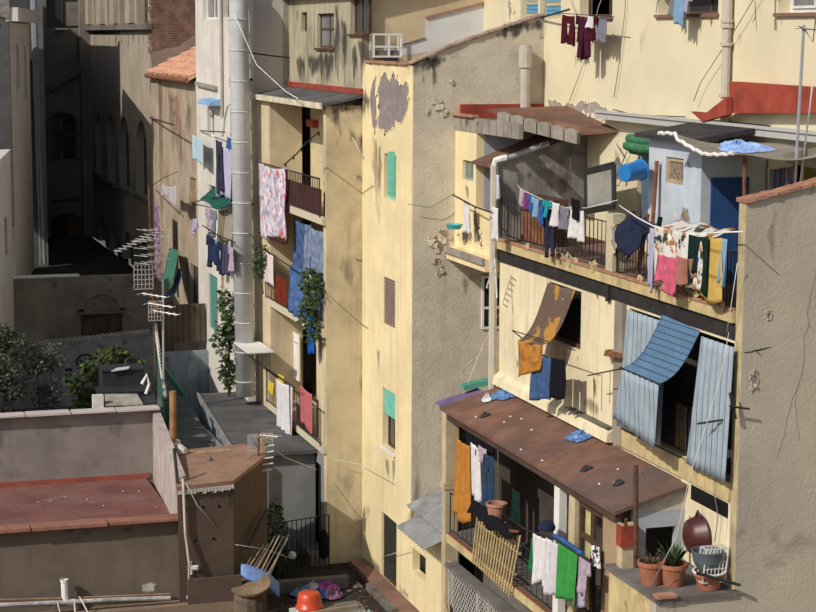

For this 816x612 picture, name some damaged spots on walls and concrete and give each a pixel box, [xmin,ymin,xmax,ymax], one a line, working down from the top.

leakage [296,8,368,77]
flaking render [370,70,410,134]
crack [776,275,816,459]